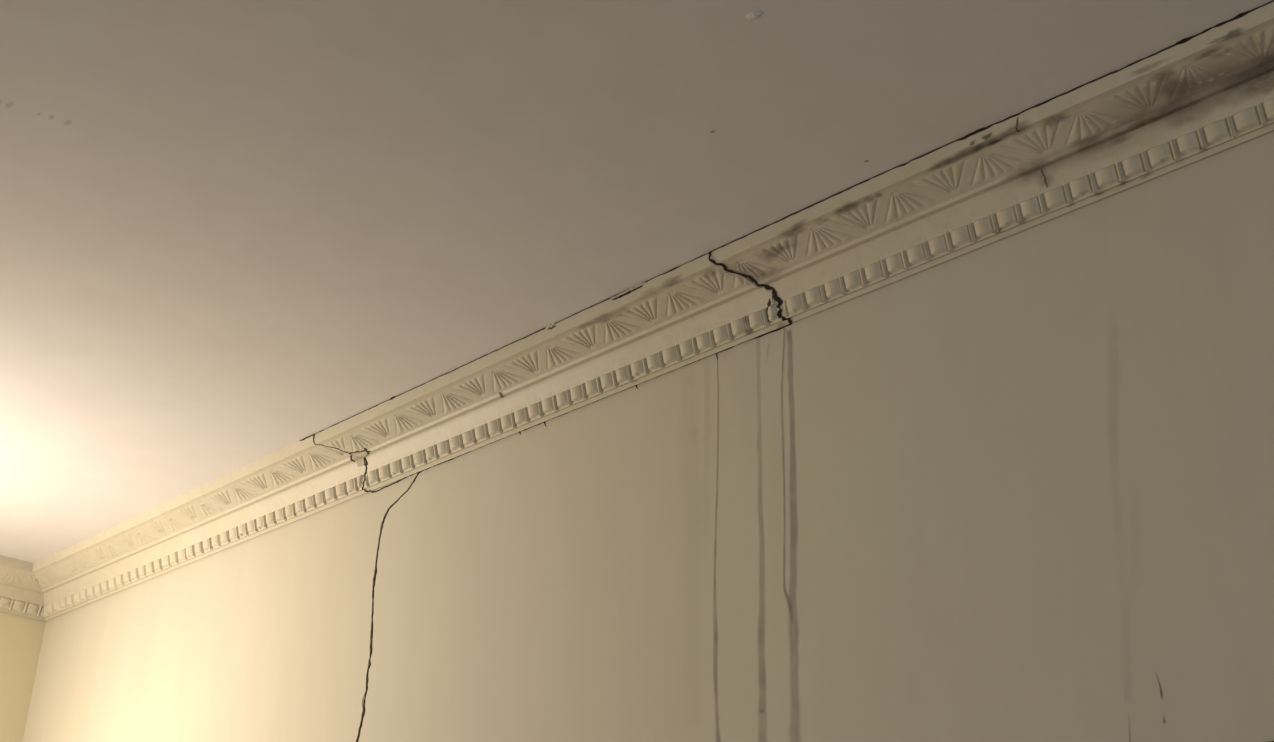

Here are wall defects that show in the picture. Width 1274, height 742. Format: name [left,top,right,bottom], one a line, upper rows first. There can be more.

crack [300,0,1274,742]